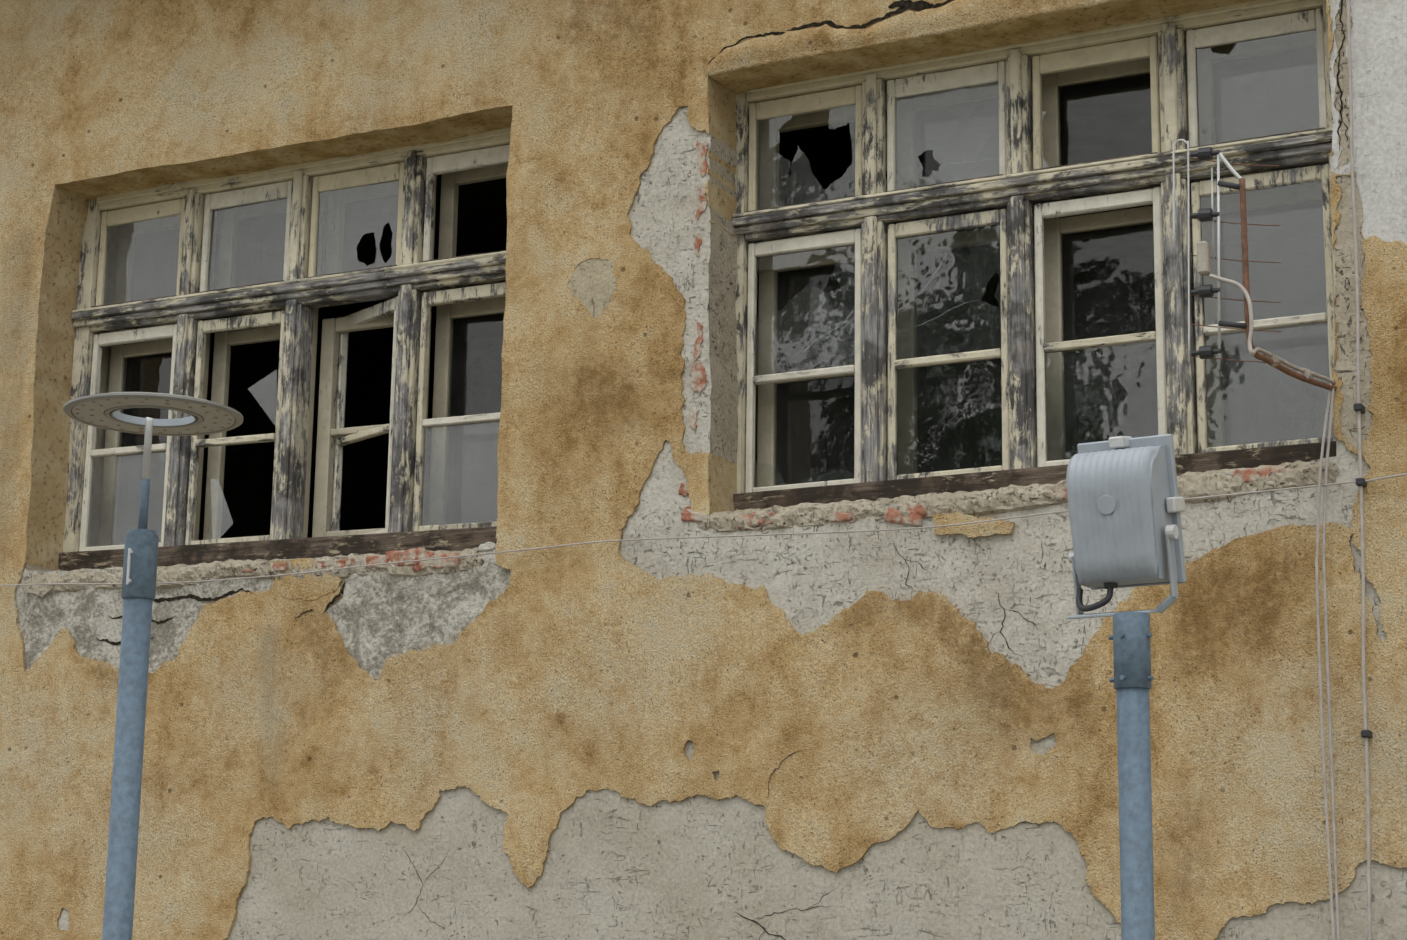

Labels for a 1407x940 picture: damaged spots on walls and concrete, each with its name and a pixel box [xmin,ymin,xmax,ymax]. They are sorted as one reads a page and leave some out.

crack [708,0,951,64]
flaking render [1329,0,1407,244]
flaking render [568,258,616,318]
flaking render [620,107,1134,689]
flaking render [1180,438,1371,563]
flaking render [16,564,123,671]
flaking render [148,544,511,681]
flaking render [225,787,1121,940]
flaking render [1215,860,1407,940]